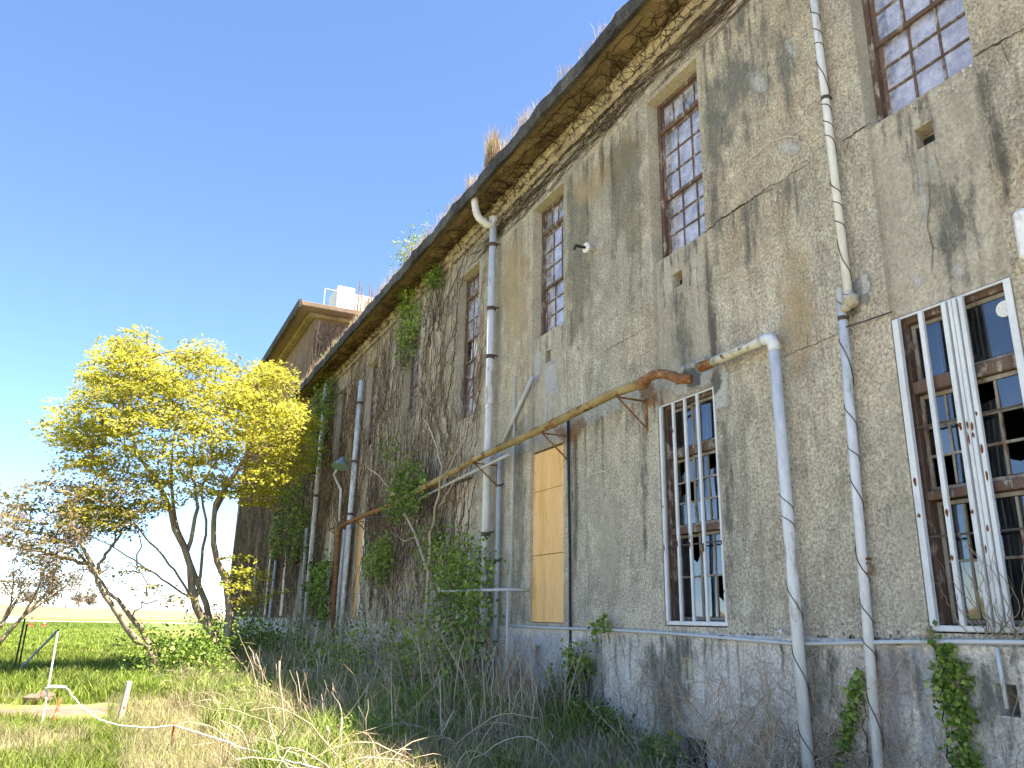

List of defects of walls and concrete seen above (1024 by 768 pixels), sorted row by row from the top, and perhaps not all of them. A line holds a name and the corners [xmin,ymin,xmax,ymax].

damp [703,4,766,57]
crack [974,28,1024,63]
damp [705,40,796,264]
crack [703,135,812,233]
crack [919,185,940,271]
damp [977,74,1008,178]
damp [646,637,688,763]